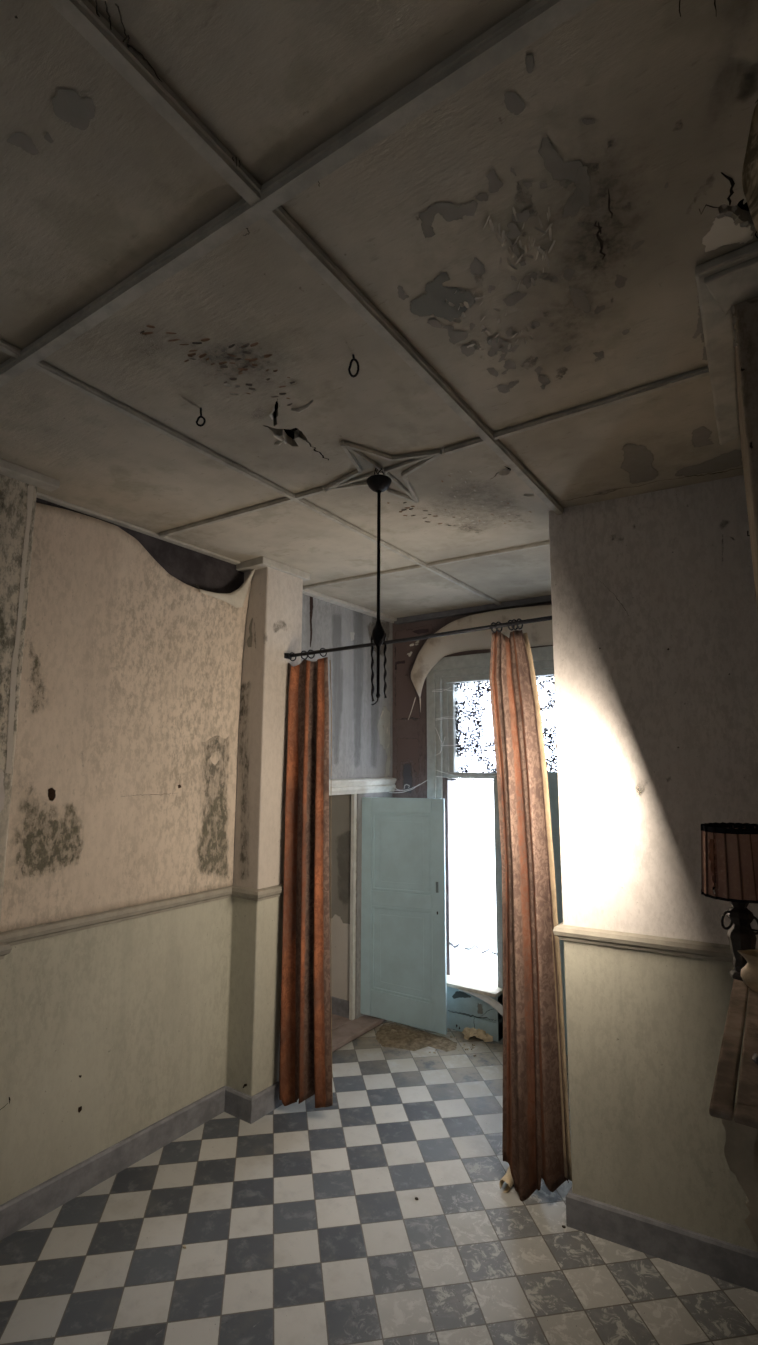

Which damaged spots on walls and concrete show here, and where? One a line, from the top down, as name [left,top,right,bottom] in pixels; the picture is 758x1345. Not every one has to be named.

peeling [398,137,605,393]
mould [16,790,80,875]
mould [198,685,249,878]